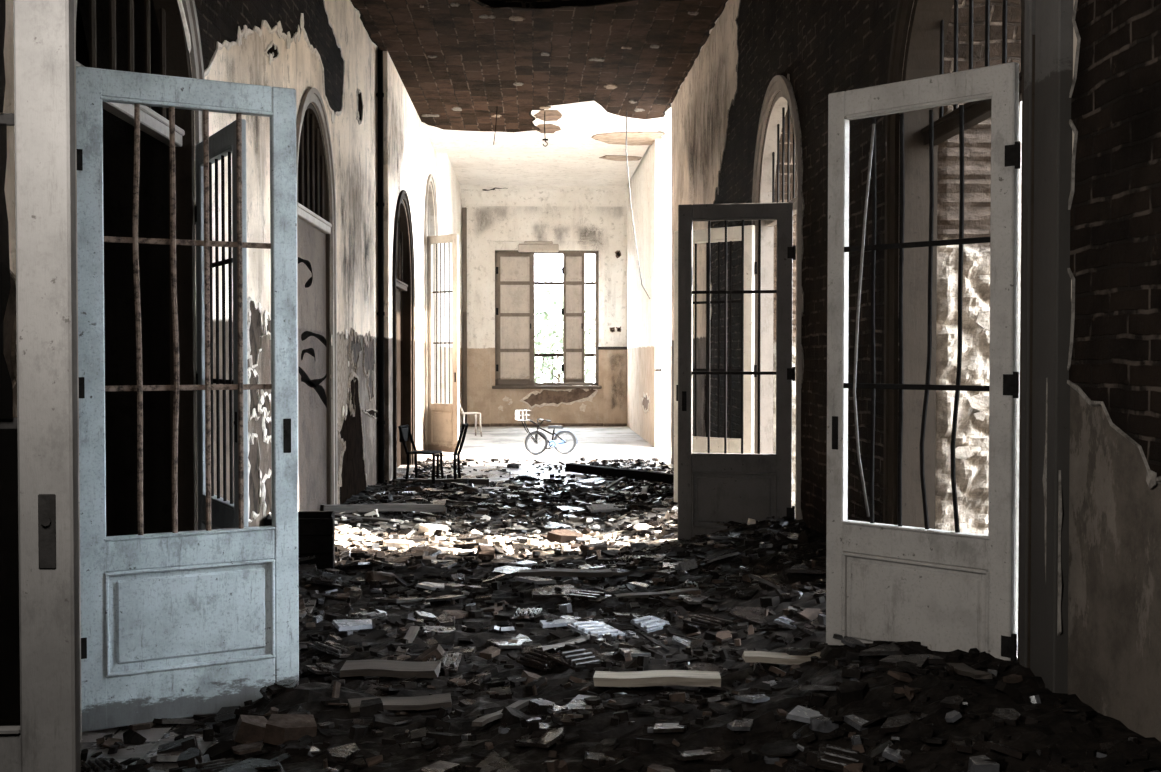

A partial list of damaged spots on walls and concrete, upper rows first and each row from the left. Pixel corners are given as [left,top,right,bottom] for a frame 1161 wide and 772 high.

peeling [177,0,363,125]
peeling [350,0,898,537]
peeling [1067,0,1161,489]
peeling [247,296,272,522]
spalling [330,328,378,505]